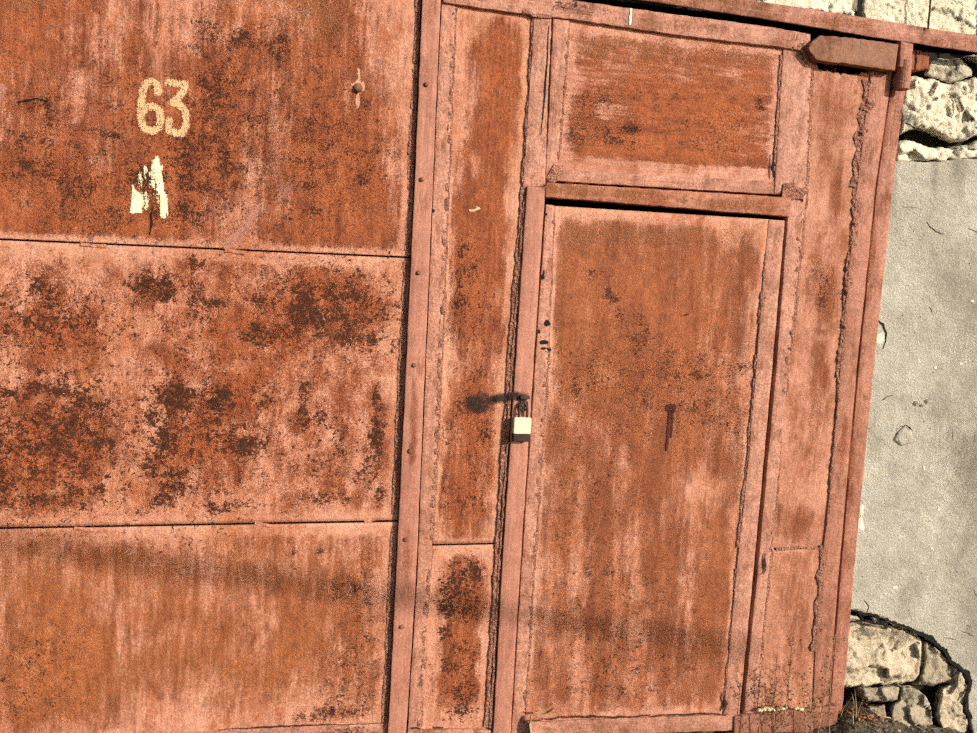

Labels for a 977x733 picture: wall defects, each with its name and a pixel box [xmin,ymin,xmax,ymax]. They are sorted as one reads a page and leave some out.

spalling [844,614,969,733]